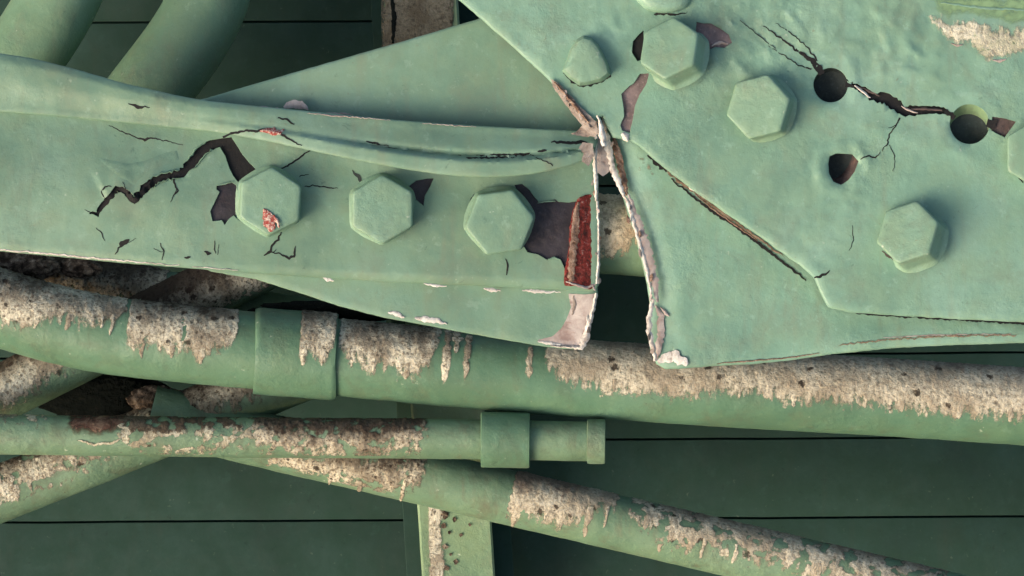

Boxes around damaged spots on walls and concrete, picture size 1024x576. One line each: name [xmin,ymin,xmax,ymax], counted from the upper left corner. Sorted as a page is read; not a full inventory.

crack [86,117,362,260]
peeling [515,184,576,268]
rust [564,194,595,289]
peeling [550,73,649,259]
crack [647,155,830,281]
crack [740,20,956,169]
peeling [929,15,1024,63]
crack [986,119,997,131]
peeling [0,249,271,365]
peeling [522,274,1024,422]
rust [68,415,126,446]
peeling [506,471,950,576]